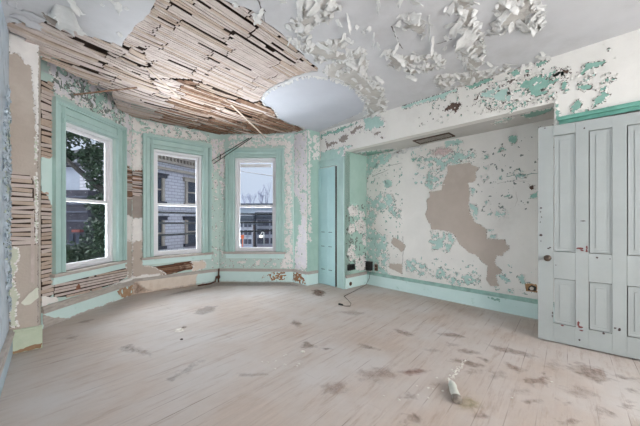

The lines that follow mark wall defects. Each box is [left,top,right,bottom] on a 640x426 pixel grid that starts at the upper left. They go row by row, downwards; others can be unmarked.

peeling [5,0,88,37]
peeling [2,85,58,328]
peeling [9,29,52,243]
corrosion [262,272,306,284]
spalling [47,0,618,302]